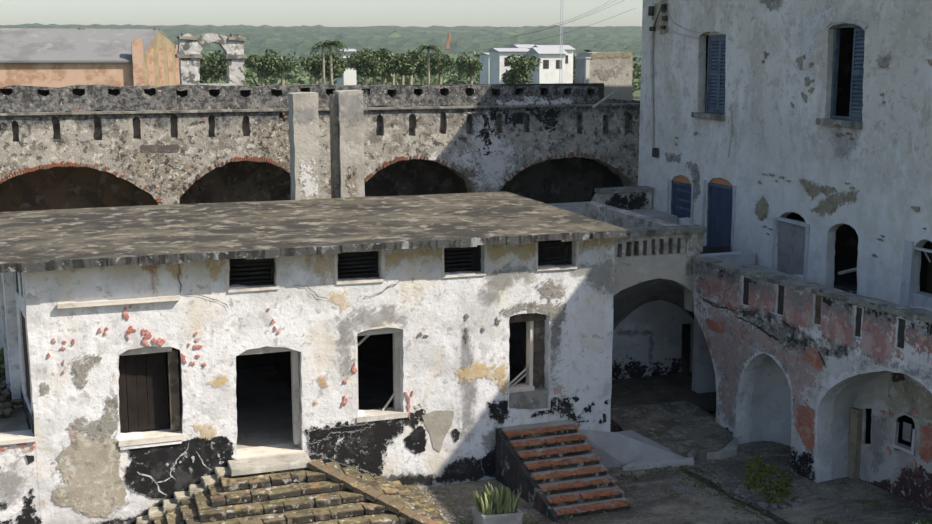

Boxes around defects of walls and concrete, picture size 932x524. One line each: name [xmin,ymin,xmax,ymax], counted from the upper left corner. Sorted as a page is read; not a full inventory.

spalling [755,196,773,235]
spalling [757,173,860,218]
peeling [123,305,165,347]
peeling [52,338,102,388]
peeling [180,332,206,367]
peeling [693,264,932,468]
peeling [51,394,131,518]
crack [137,443,210,495]
damp [385,456,484,486]